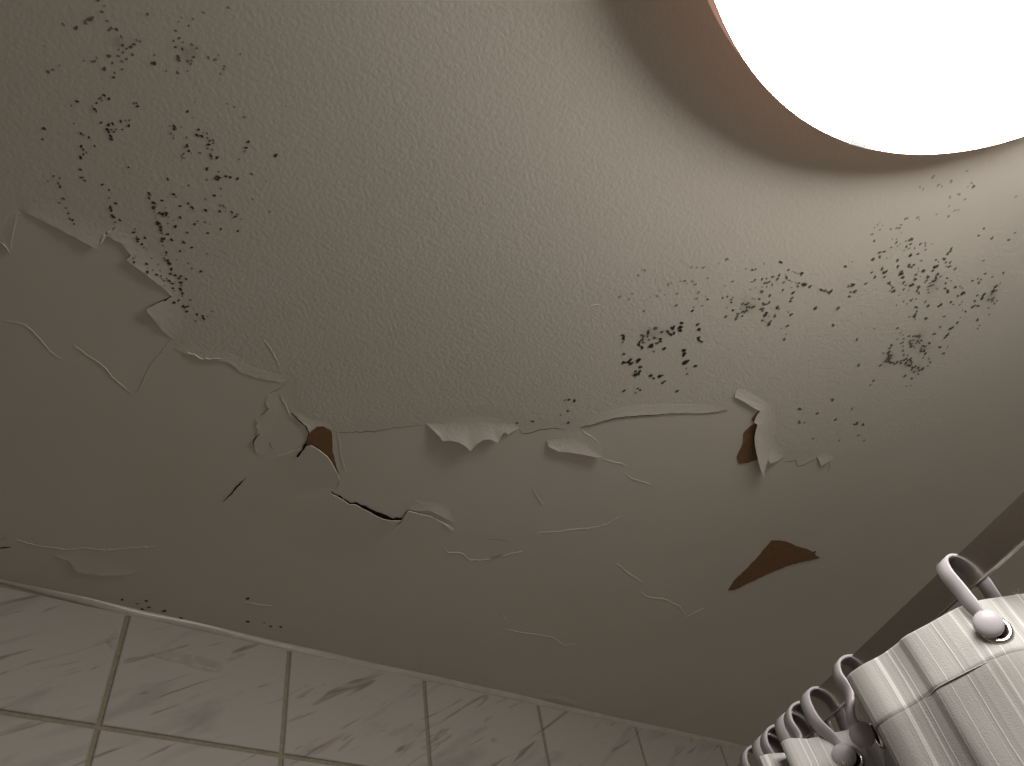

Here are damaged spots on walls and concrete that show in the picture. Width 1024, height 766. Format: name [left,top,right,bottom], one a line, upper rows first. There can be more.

mould [61,0,141,79]
mould [133,110,253,322]
peeling [19,197,185,393]
mould [621,298,709,393]
mould [722,261,833,341]
mould [848,224,1004,387]
spalling [291,411,346,473]
peeling [426,416,519,451]
peeling [546,402,727,464]
peeling [735,388,786,477]
crack [331,491,407,521]
spalling [728,540,820,591]